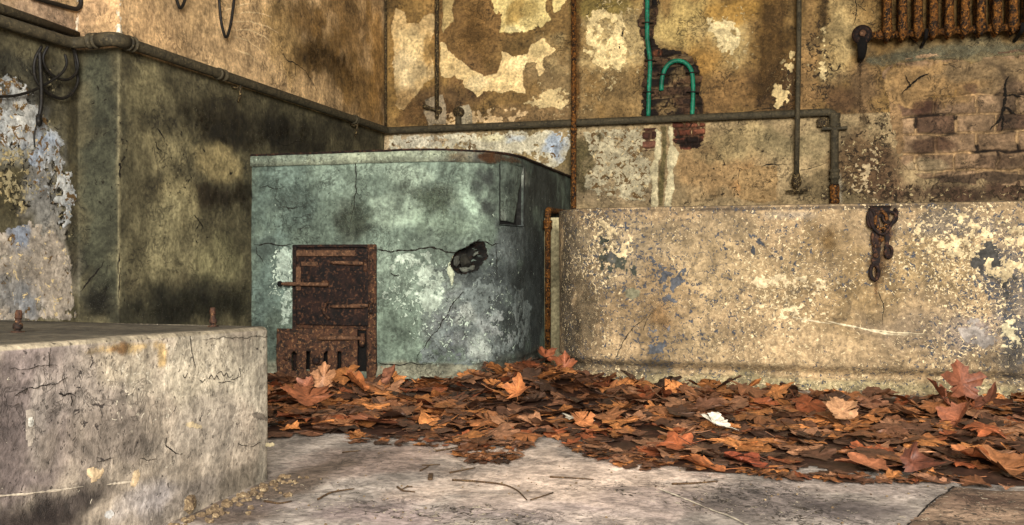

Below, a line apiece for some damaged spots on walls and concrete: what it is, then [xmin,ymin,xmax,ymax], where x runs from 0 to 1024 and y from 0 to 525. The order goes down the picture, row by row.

peeling [389,0,570,168]
peeling [583,0,705,201]
crack [990,76,1024,131]
peeling [0,74,77,321]
crack [378,292,463,366]
crack [373,239,499,280]
peeling [379,241,532,366]
peeling [907,212,1024,299]